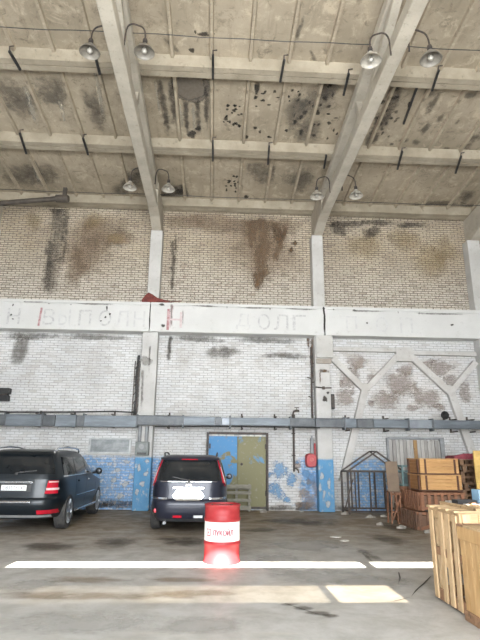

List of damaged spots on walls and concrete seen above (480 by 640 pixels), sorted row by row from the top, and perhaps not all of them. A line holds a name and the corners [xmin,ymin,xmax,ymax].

leakage [158,81,175,128]
leakage [196,88,209,126]
leakage [290,84,336,136]
leakage [366,87,400,145]
leakage [46,209,68,288]
leakage [332,220,390,236]
leakage [13,333,42,360]
peeling [108,459,149,499]
peeling [269,461,330,508]